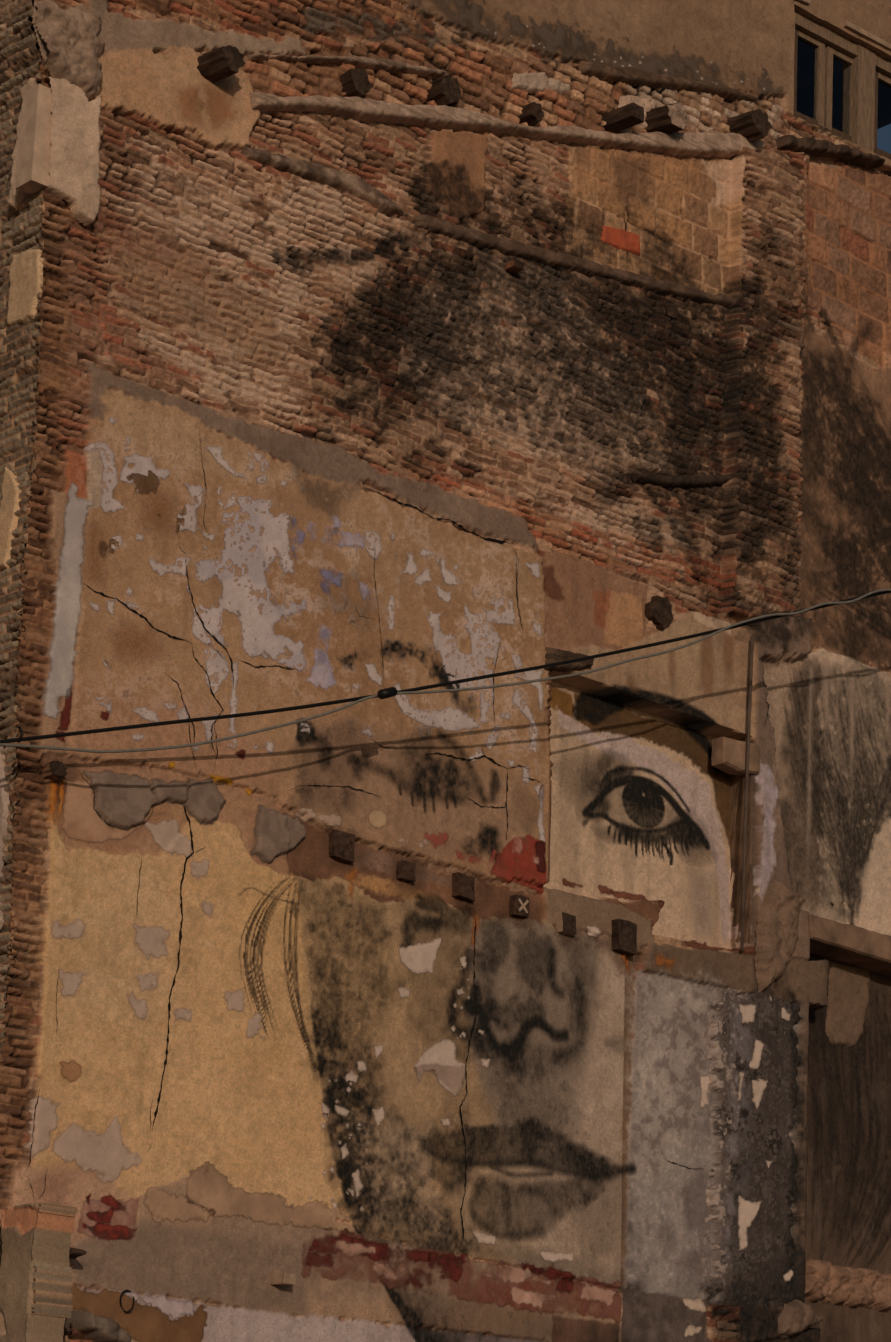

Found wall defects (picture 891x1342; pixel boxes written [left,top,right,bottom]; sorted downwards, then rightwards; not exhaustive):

peeling [43,437,170,742]
peeling [132,446,336,759]
peeling [333,518,544,761]
spalling [62,770,226,843]
crack [79,428,298,1150]
peeling [399,938,441,974]
peeling [321,1044,385,1175]
peeling [415,1026,484,1096]
peeling [738,1040,767,1108]
peeling [77,1161,622,1323]
peeling [738,1196,761,1250]
peeling [71,1283,207,1342]